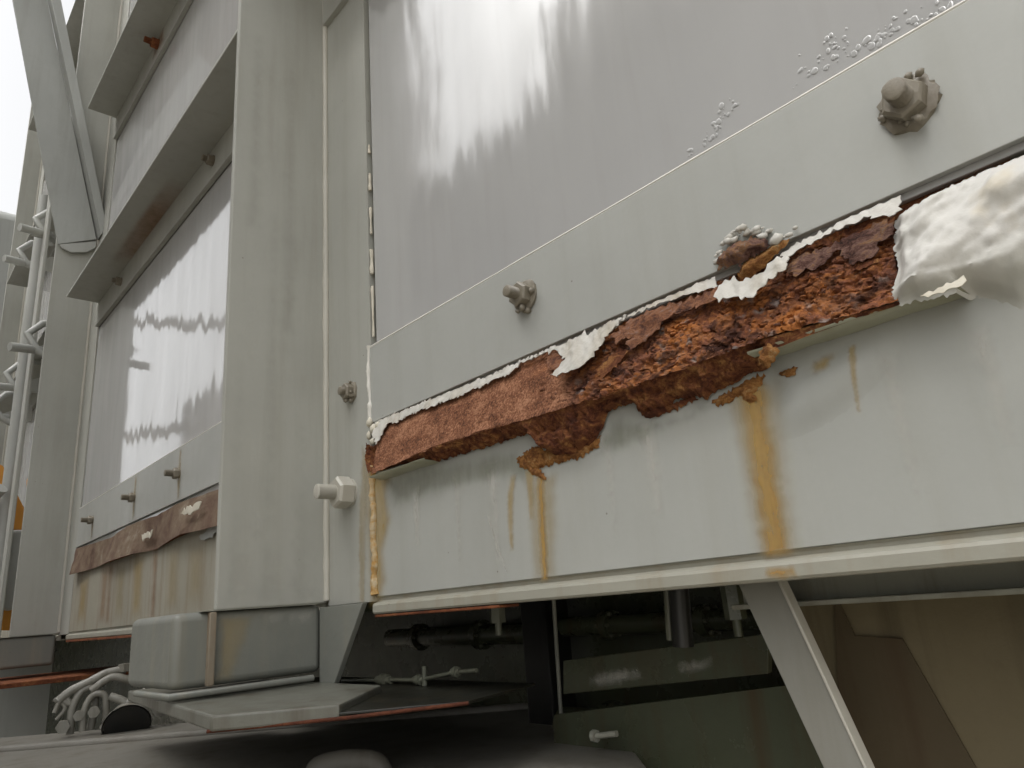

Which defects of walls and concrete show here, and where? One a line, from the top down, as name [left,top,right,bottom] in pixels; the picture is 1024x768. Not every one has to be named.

rust [368,214,900,596]
peeling [372,195,903,444]